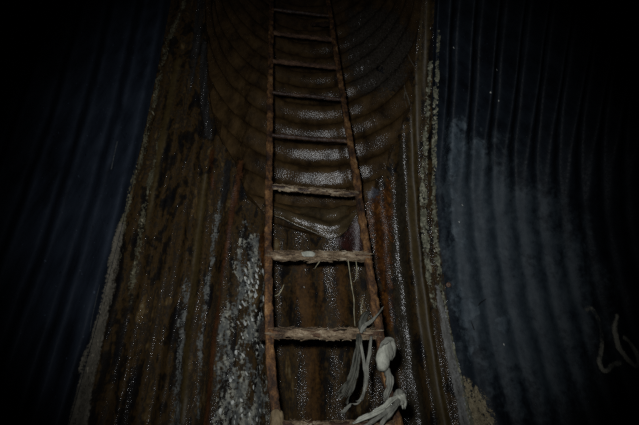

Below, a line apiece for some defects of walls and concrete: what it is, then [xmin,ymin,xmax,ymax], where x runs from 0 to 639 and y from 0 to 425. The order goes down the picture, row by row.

rust [204,160,243,425]
rust [335,179,394,330]
water stain [391,1,619,425]